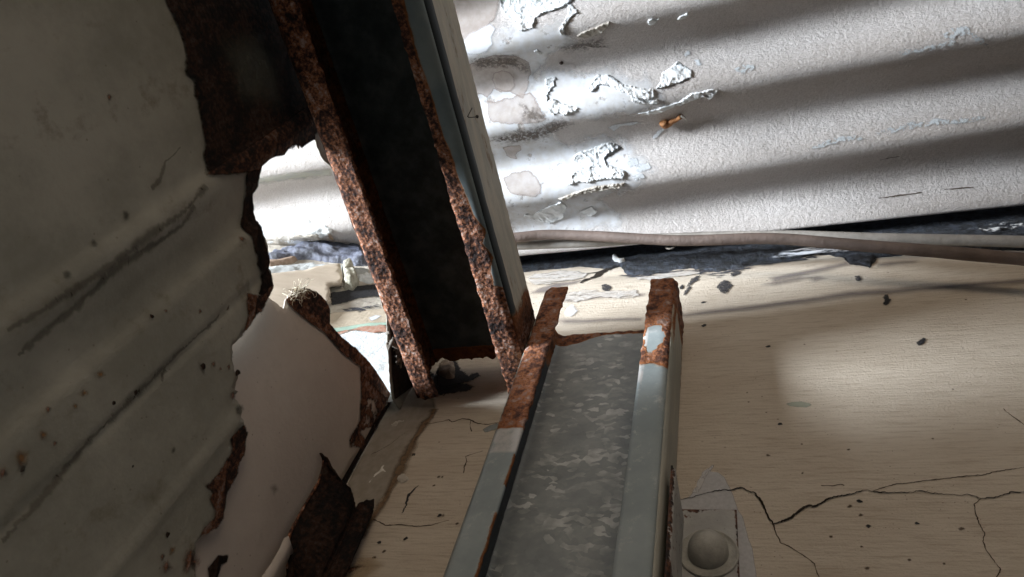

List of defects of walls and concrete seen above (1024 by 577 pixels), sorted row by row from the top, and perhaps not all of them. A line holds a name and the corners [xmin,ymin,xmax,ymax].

rust [166,0,318,336]
peeling [543,76,578,115]
water stain [464,0,662,232]
peeling [523,142,625,224]
peeling [587,61,718,115]
rust [286,287,413,449]
crack [680,467,1022,577]